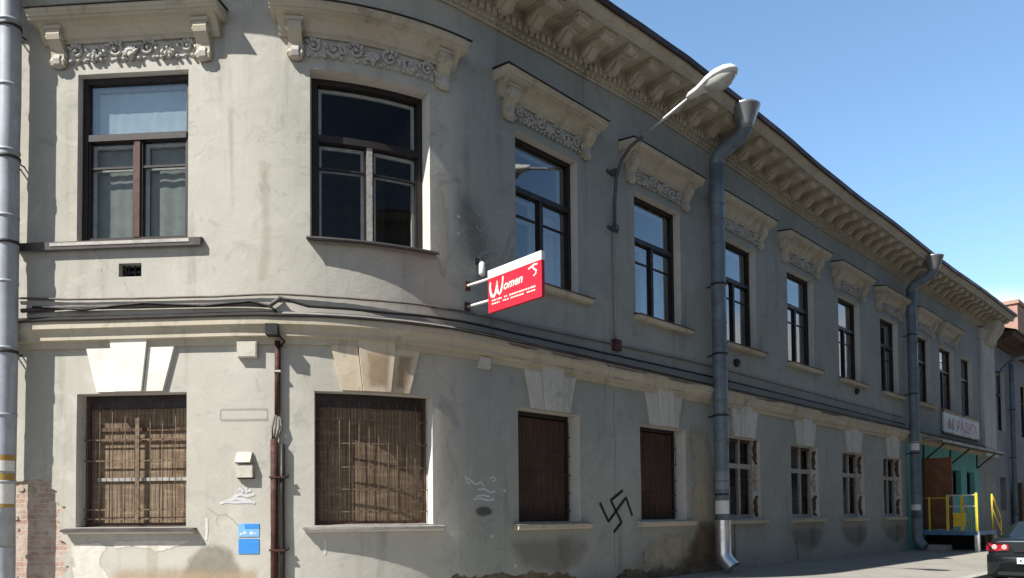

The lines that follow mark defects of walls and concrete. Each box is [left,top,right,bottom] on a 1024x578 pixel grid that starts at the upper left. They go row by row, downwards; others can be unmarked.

flaking render [16,479,193,578]
leakage [119,548,253,578]